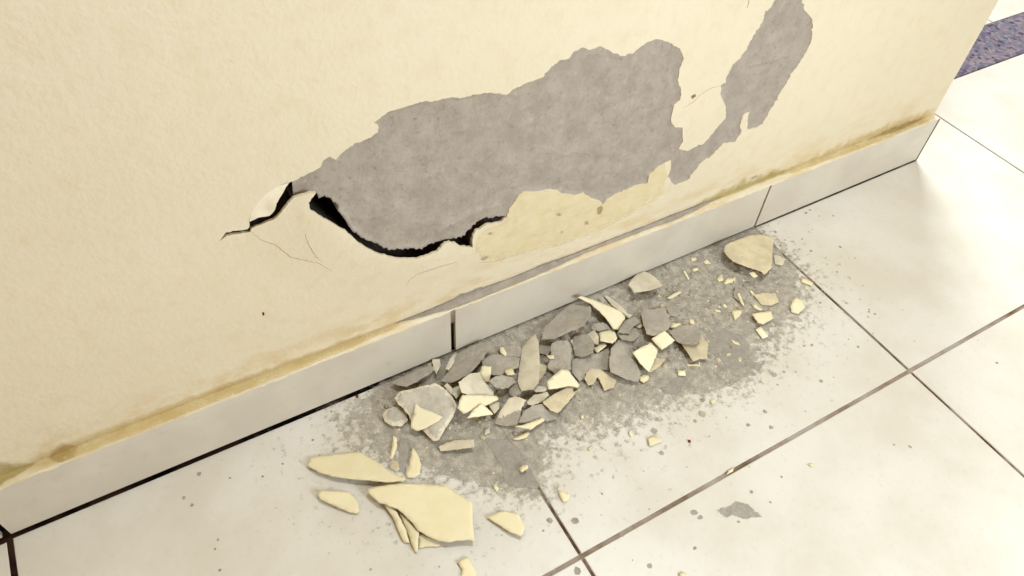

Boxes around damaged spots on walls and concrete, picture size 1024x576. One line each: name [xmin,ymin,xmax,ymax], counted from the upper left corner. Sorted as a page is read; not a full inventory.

peeling [249,0,812,260]
crack [253,186,329,270]
peeling [724,234,785,275]